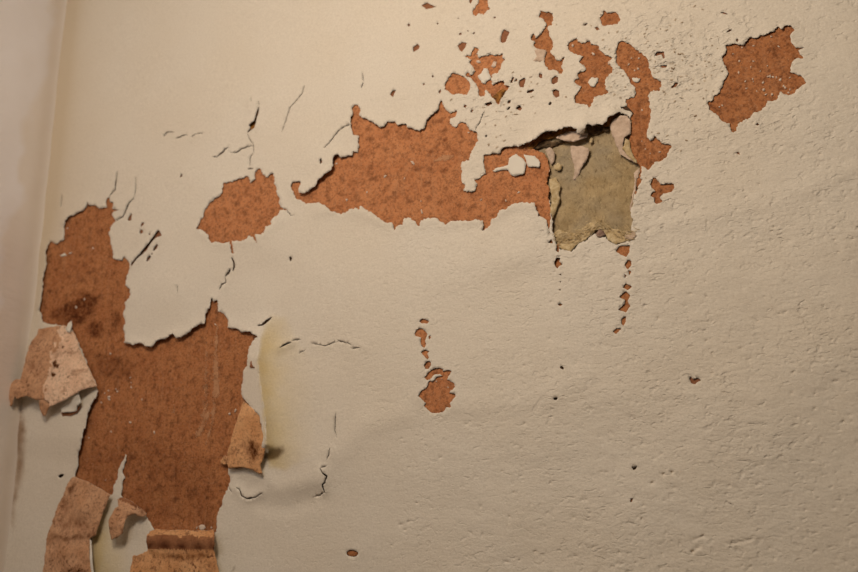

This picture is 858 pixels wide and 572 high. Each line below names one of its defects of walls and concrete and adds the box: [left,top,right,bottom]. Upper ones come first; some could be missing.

crack [217,100,259,170]
peeling [291,11,806,290]
peeling [196,169,292,254]
peeling [9,171,265,572]
peeling [415,319,455,413]
crack [315,417,337,497]